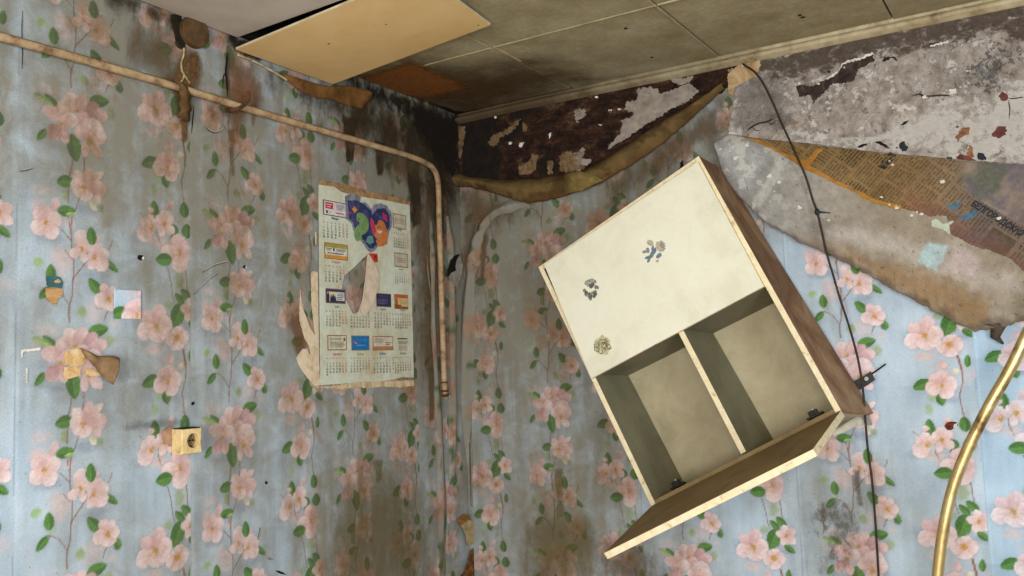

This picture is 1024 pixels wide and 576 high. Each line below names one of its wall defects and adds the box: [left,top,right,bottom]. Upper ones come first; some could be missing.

peeling [277,71,373,109]
flaking render [728,8,1024,164]
leakage [300,60,738,420]
leakage [820,506,851,555]